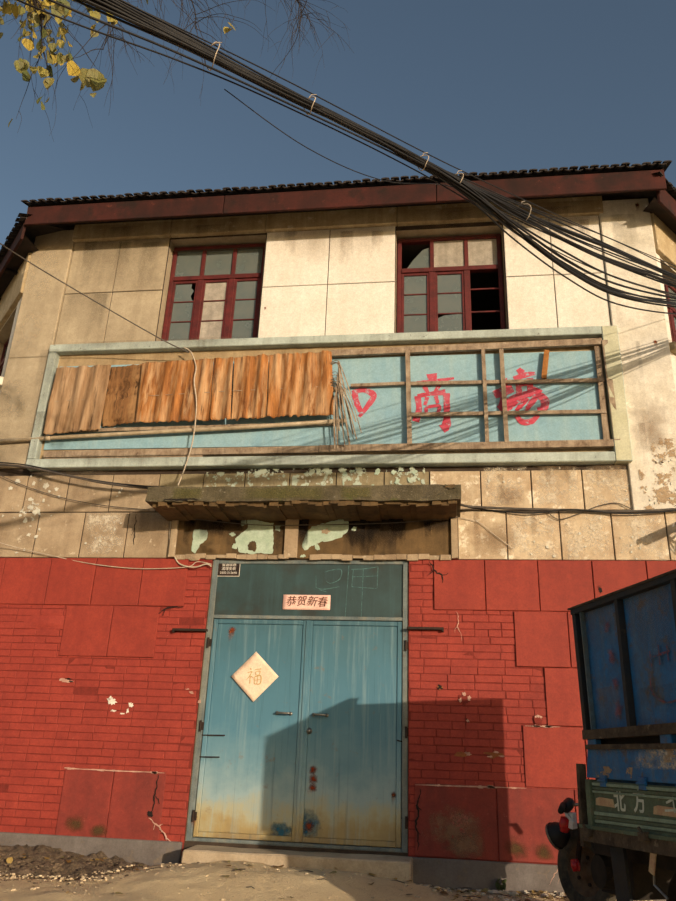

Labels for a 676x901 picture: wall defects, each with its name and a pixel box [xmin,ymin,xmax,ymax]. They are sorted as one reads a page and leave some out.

peeling [206,466,425,487]
peeling [2,475,60,538]
peeling [620,438,676,560]
peeling [192,529,208,553]
peeling [229,520,280,554]
peeling [300,519,357,558]
crack [147,775,170,841]
rust [273,824,291,842]
rust [303,813,319,836]
crack [414,789,422,850]